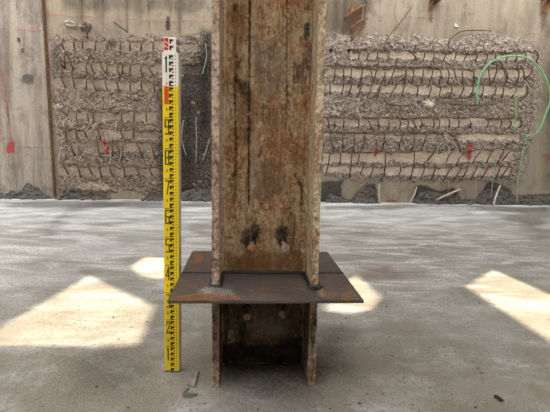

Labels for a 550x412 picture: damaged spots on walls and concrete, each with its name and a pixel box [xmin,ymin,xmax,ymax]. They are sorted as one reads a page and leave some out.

spalling [48,19,170,199]
spalling [177,30,212,193]
rust [232,0,255,205]
spalling [321,0,544,186]